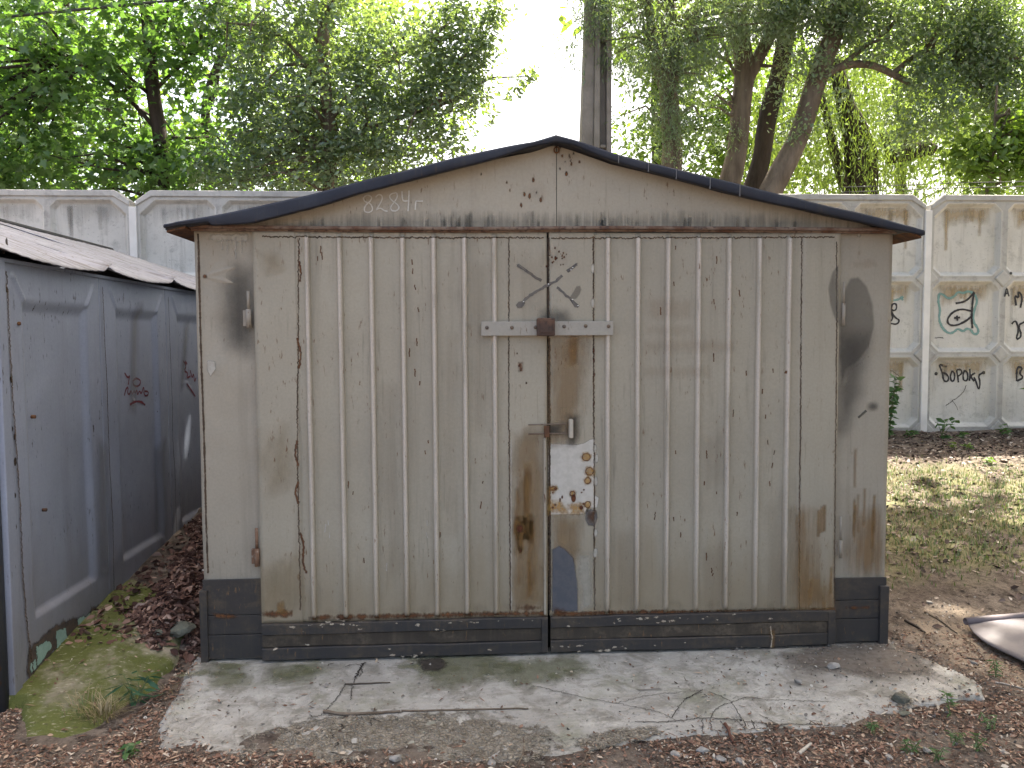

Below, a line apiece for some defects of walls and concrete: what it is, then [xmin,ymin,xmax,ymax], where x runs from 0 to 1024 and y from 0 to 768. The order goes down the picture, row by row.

rust [546,238,567,318]
peeling [262,235,835,610]
rust [312,338,765,620]
peeling [27,601,103,679]
rust [263,604,292,618]
crack [533,685,838,734]